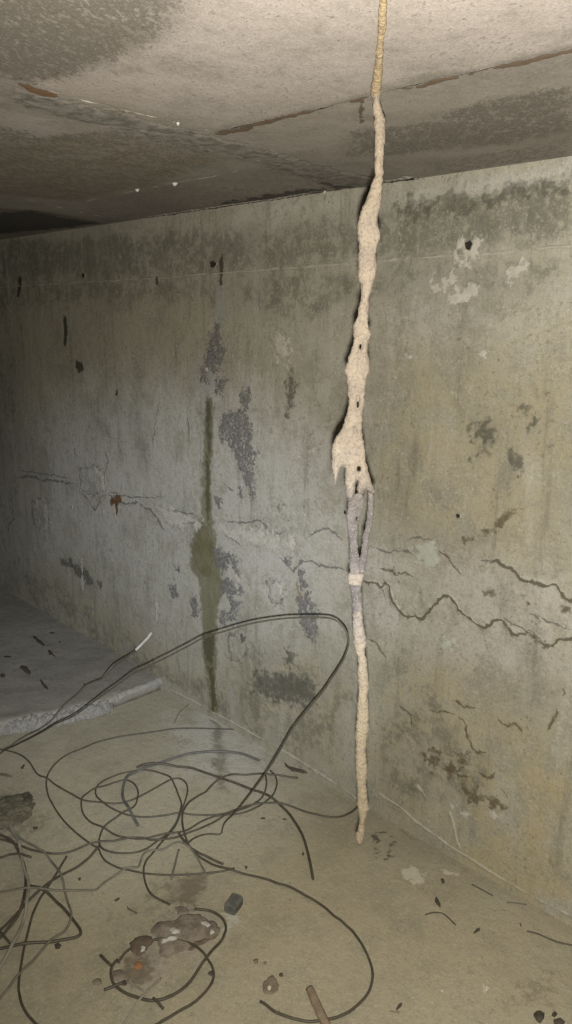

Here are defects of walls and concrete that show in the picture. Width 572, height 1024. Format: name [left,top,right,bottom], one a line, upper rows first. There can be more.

rust [18,73,59,98]
rust [402,73,474,90]
rust [486,49,572,70]
rust [214,110,315,135]
peeling [428,267,481,305]
peeling [199,320,229,397]
peeling [217,387,259,505]
rust [110,495,122,515]
water stain [133,277,304,712]
crack [13,446,572,653]
peeling [284,556,321,644]
water stain [250,650,315,707]